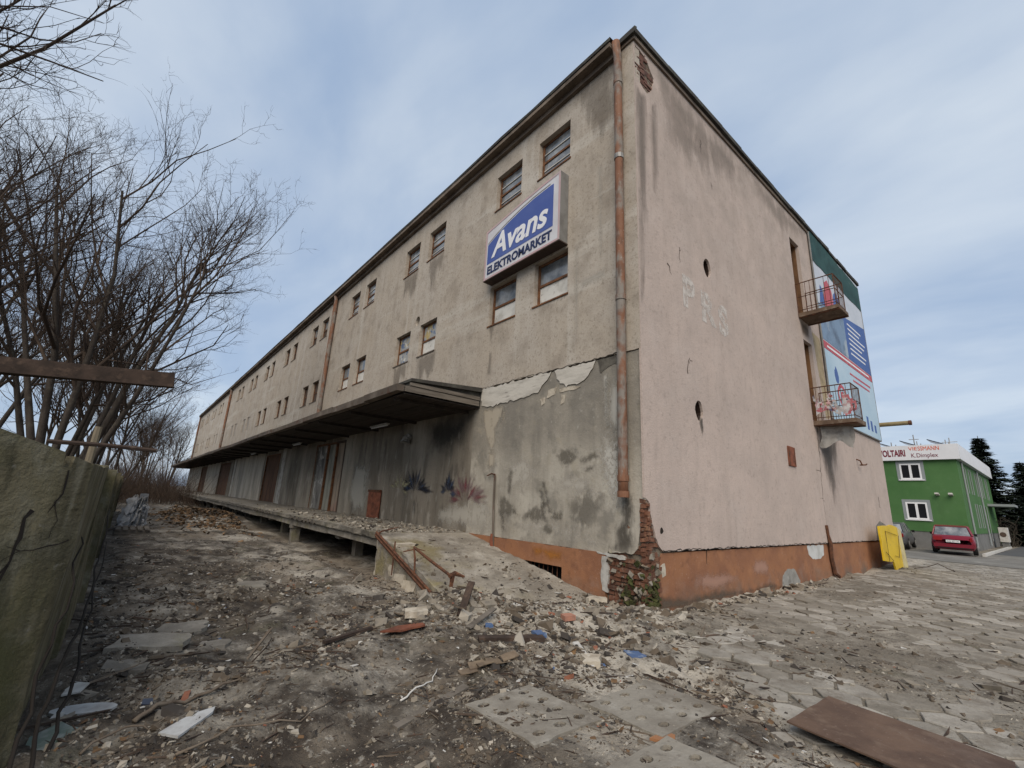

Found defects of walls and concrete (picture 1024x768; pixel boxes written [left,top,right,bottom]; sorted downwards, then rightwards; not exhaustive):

spalling [635,53,653,93]
flaking render [481,355,617,466]
water stain [439,462,570,535]
water stain [560,437,631,549]
spalling [596,498,666,608]
flaking render [807,545,824,560]